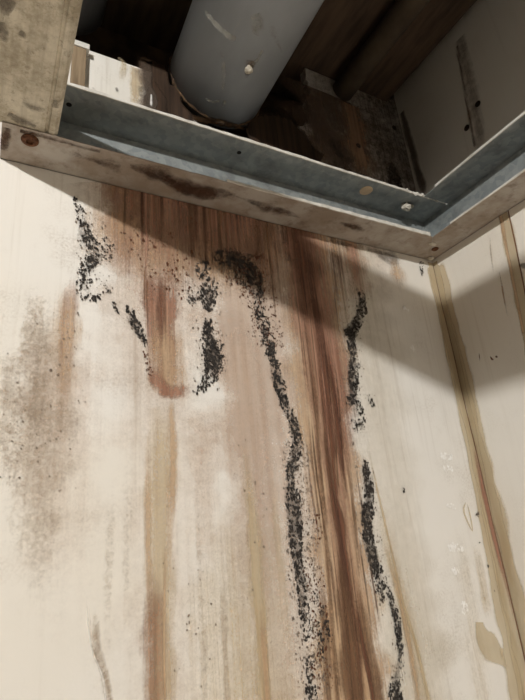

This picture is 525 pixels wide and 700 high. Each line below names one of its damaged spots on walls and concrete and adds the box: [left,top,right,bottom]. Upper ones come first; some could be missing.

leakage [245,75,426,192]
leakage [41,185,333,700]
leakage [331,237,375,445]
leakage [355,459,430,700]